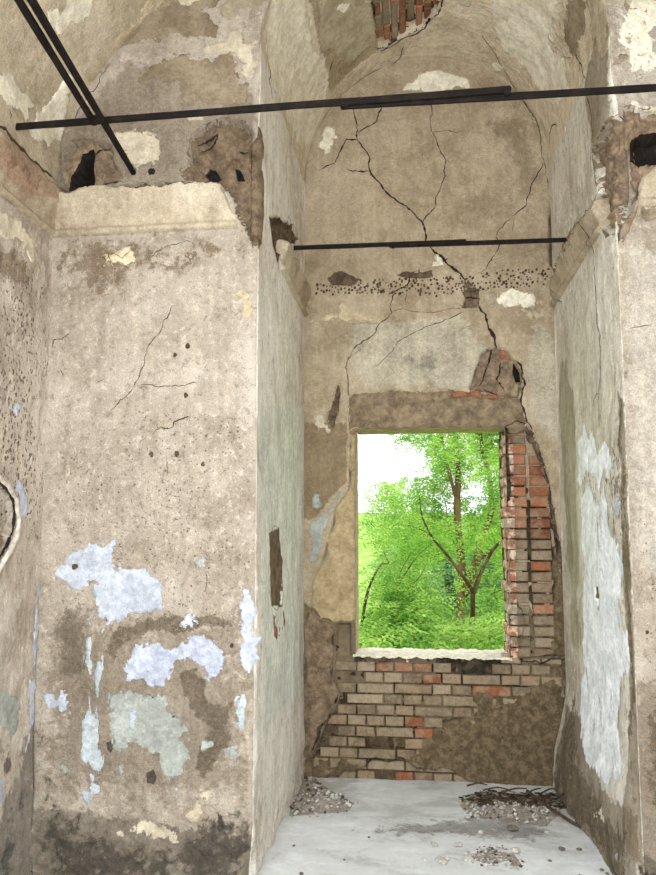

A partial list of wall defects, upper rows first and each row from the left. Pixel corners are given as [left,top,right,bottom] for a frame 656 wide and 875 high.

flaking render [86,0,445,248]
crack [305,0,556,281]
crack [113,306,197,409]
crack [345,270,497,394]
crack [516,361,532,429]
peeling [54,539,165,625]
leakage [43,777,254,875]
peeling [108,586,262,792]
flaking render [303,420,566,786]
leakage [554,696,652,875]
peeling [577,424,632,787]
leakage [622,514,636,737]